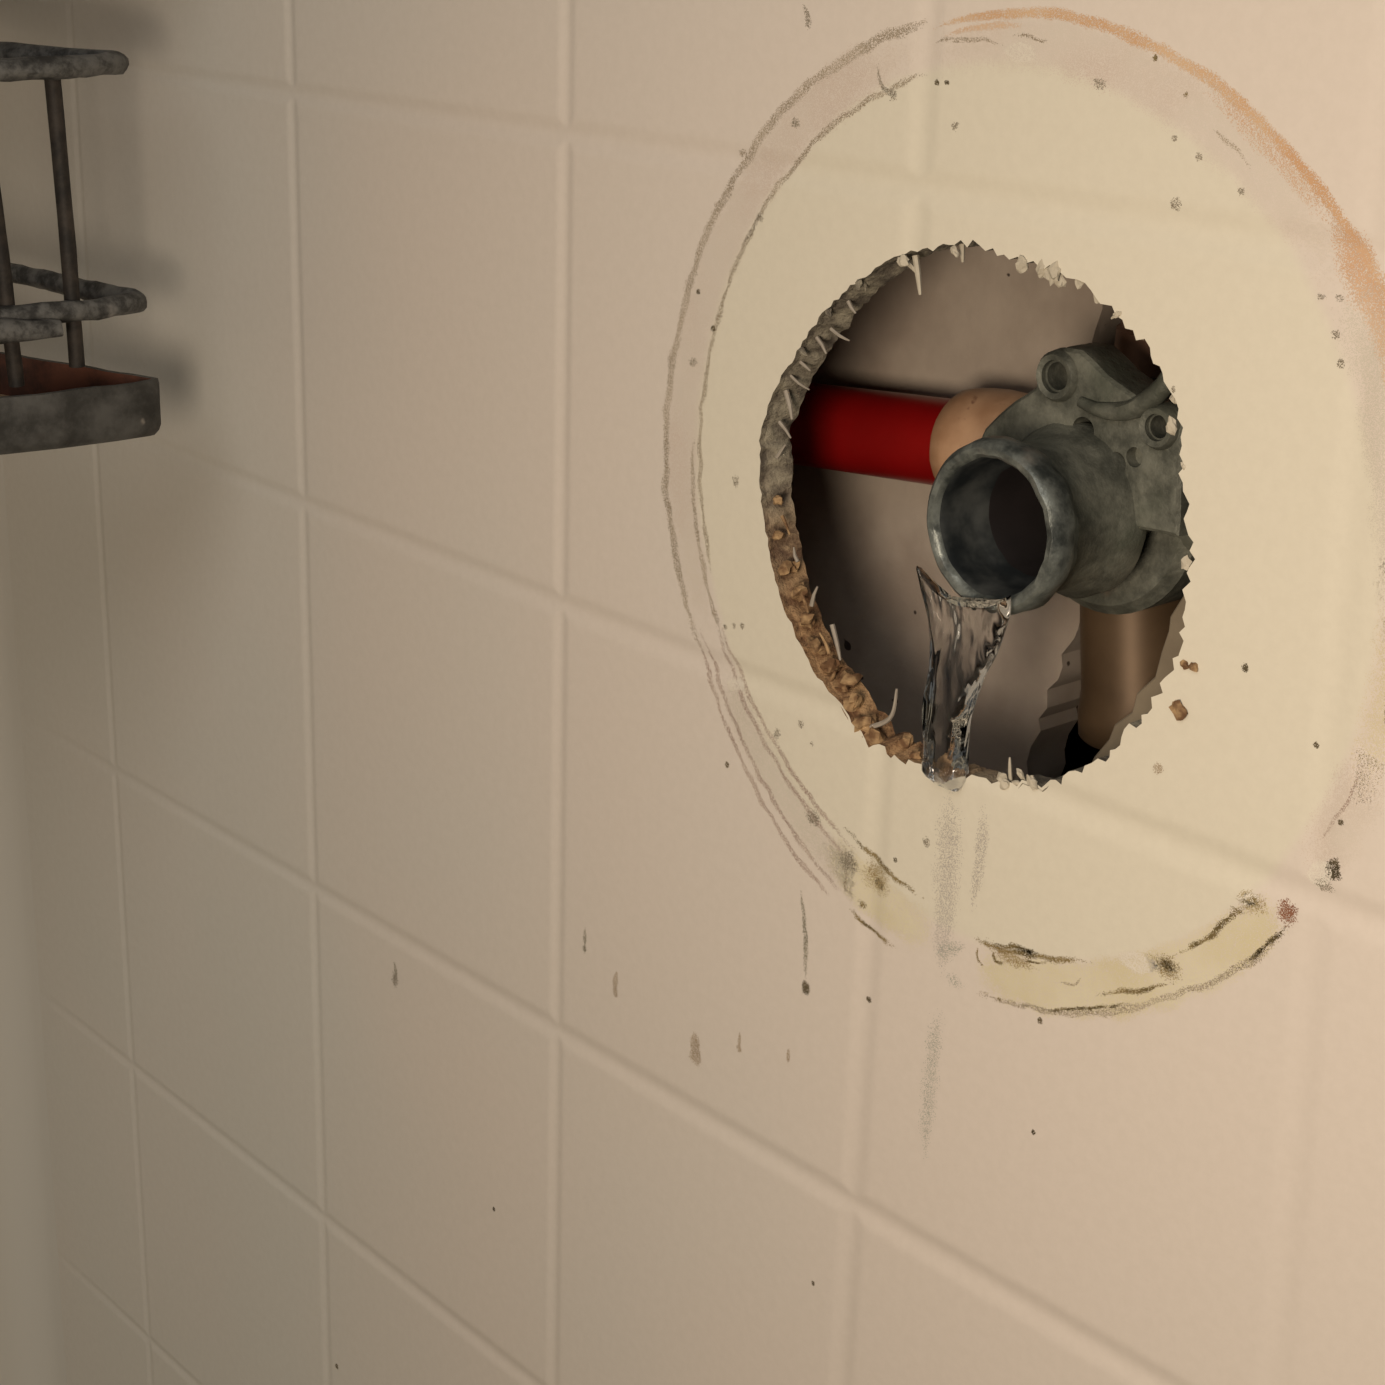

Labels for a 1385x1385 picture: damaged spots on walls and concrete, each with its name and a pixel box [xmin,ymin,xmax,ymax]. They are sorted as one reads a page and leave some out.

rust [935,6,1385,385]
spalling [1015,255,1099,304]
spalling [1166,395,1177,436]
spalling [764,243,965,759]
spalling [1180,660,1198,672]
spalling [1169,700,1188,721]
spalling [1061,706,1100,776]
spalling [968,757,1048,792]
damp [836,851,897,909]
damp [922,792,990,989]
damp [1230,889,1267,917]
damp [1147,953,1183,980]